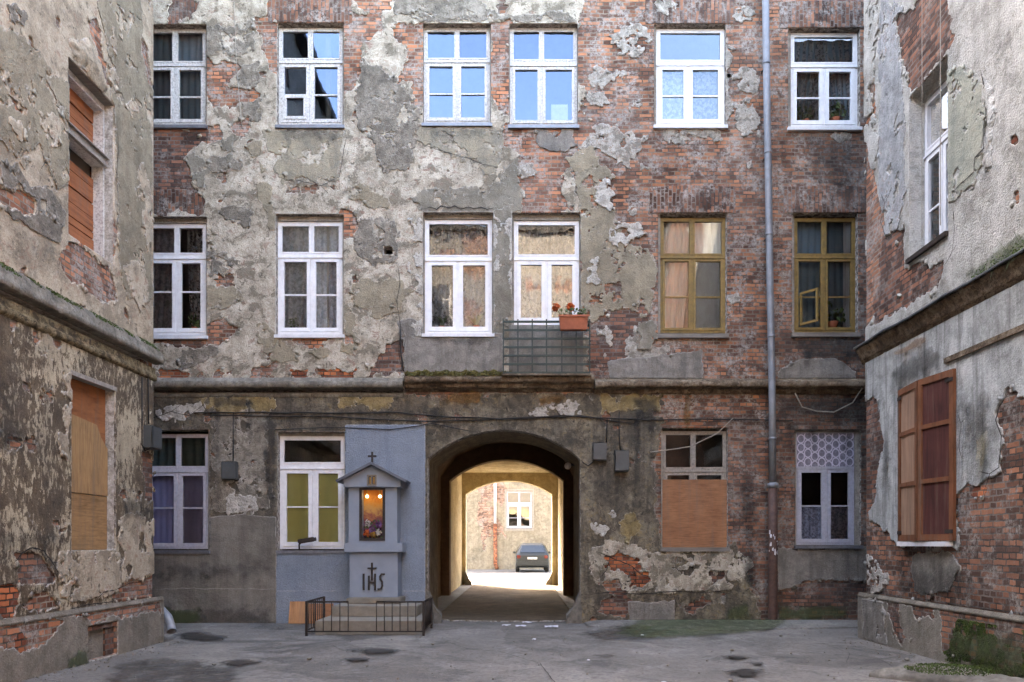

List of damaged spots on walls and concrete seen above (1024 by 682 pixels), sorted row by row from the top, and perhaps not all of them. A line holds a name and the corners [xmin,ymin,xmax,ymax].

peeling [0,0,673,379]
peeling [830,0,987,326]
peeling [0,450,161,654]
peeling [588,510,754,617]
water stain [787,400,863,417]
spalling [785,384,1024,677]